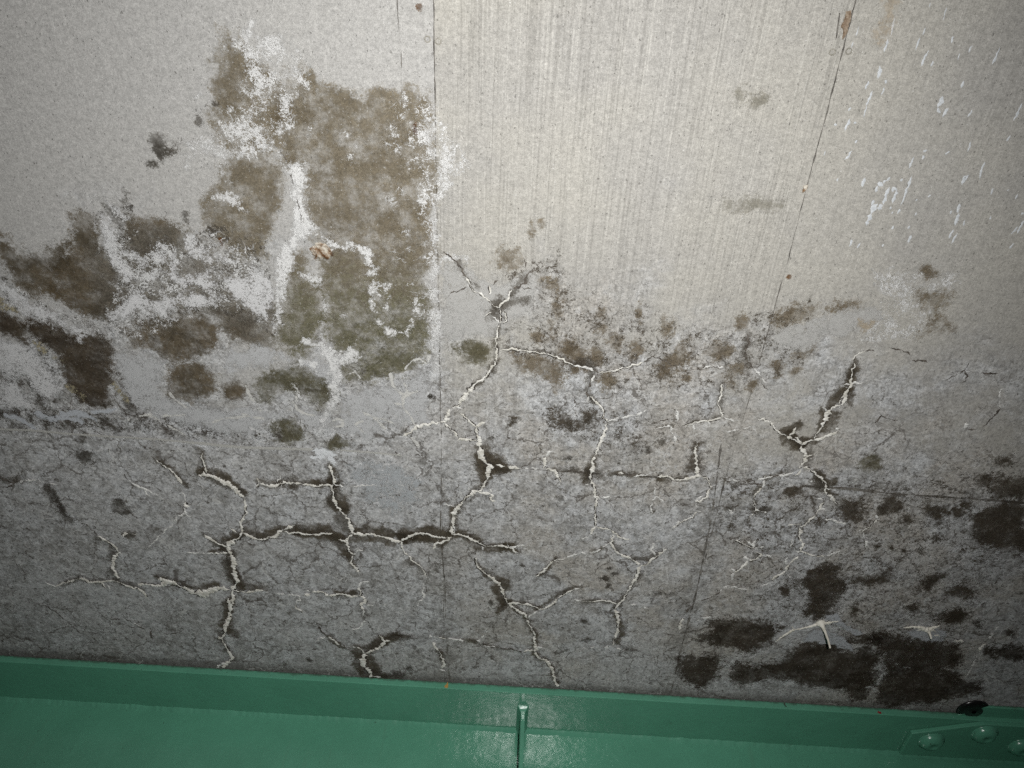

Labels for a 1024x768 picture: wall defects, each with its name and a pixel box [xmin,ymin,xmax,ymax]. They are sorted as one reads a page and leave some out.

water stain [0,19,962,523]
crack [38,252,927,687]
water stain [669,454,1024,708]